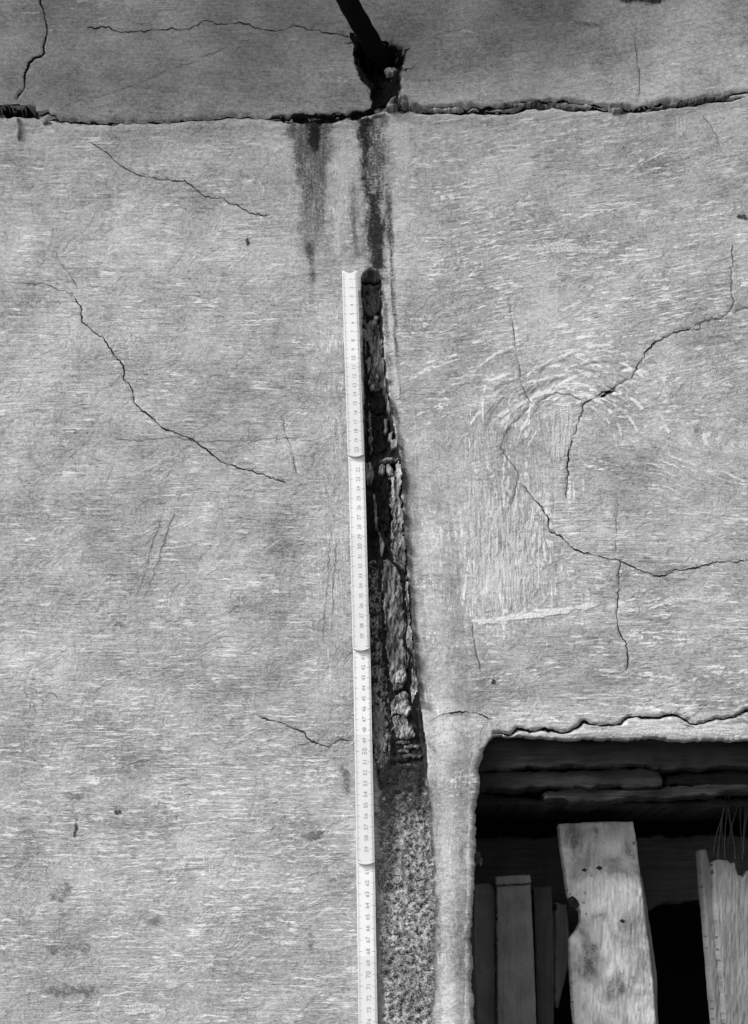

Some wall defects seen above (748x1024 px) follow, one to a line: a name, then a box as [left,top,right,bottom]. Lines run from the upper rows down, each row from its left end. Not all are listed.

crack [17,0,47,98]
crack [35,20,748,217]
damp [287,112,411,398]
crack [21,253,299,483]
crack [500,245,748,670]
crack [258,715,350,754]
crack [380,529,748,740]